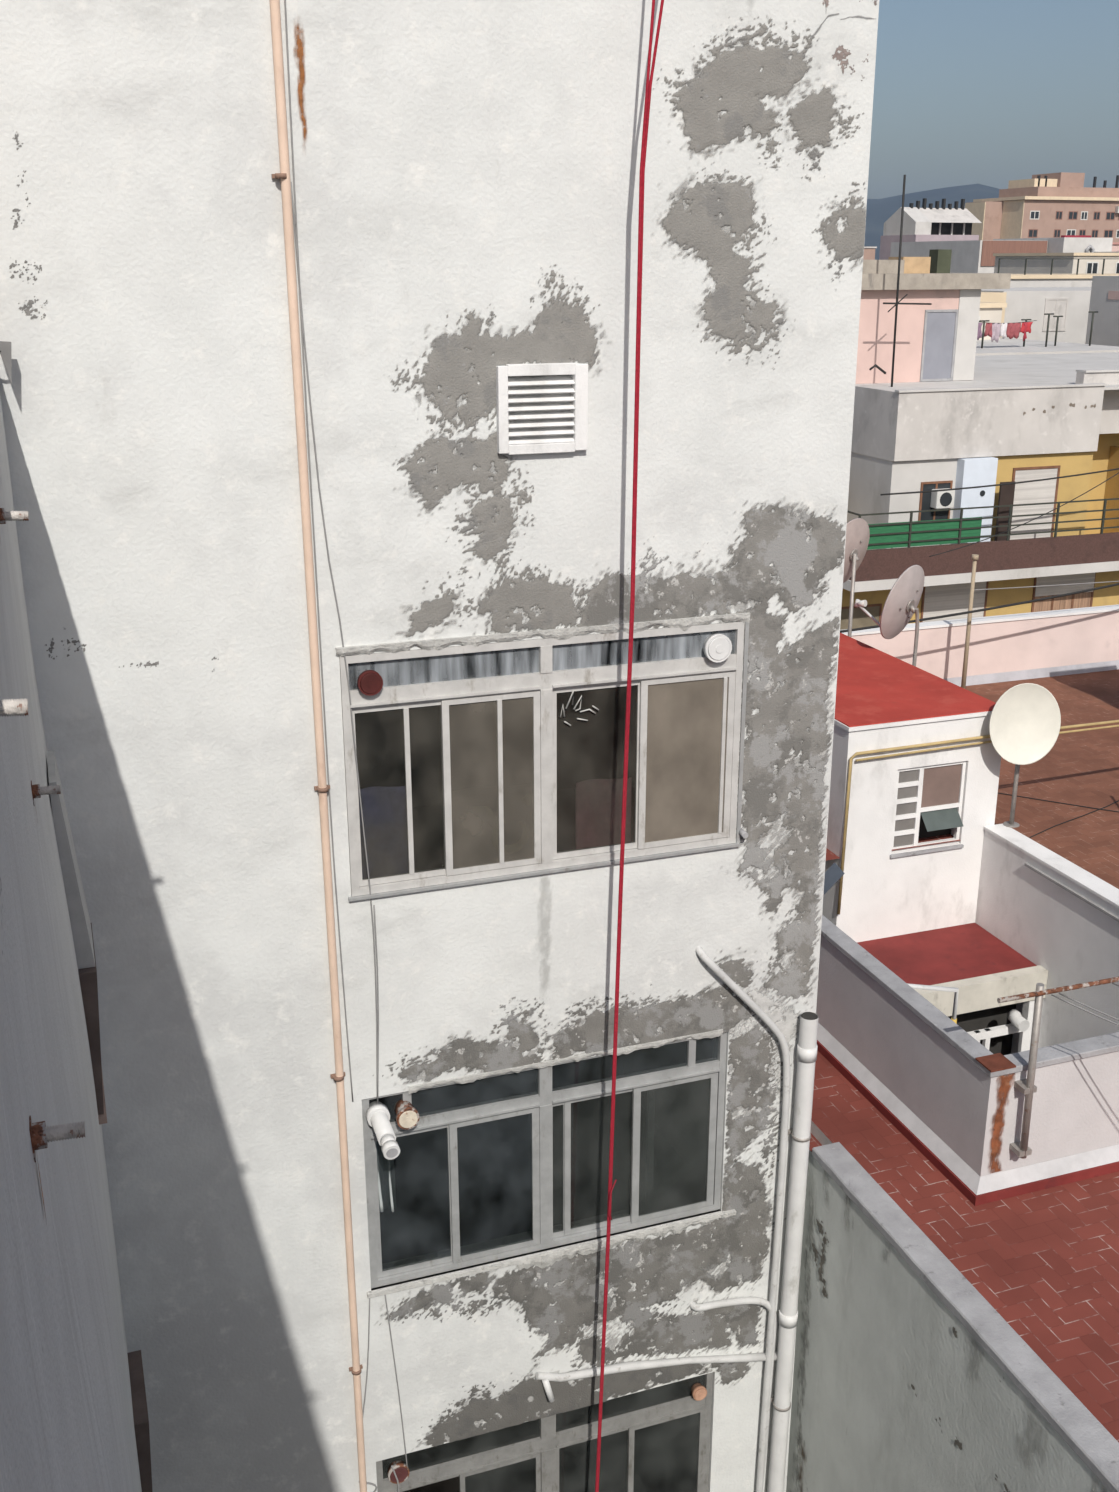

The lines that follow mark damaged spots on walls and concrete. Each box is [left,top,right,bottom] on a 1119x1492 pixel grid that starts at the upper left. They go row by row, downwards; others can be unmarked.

corrosion [295,26,307,139]
peeling [832,45,868,81]
peeling [722,1025,791,1225]
corrosion [989,1073,1015,1173]
peeling [712,1362,749,1385]